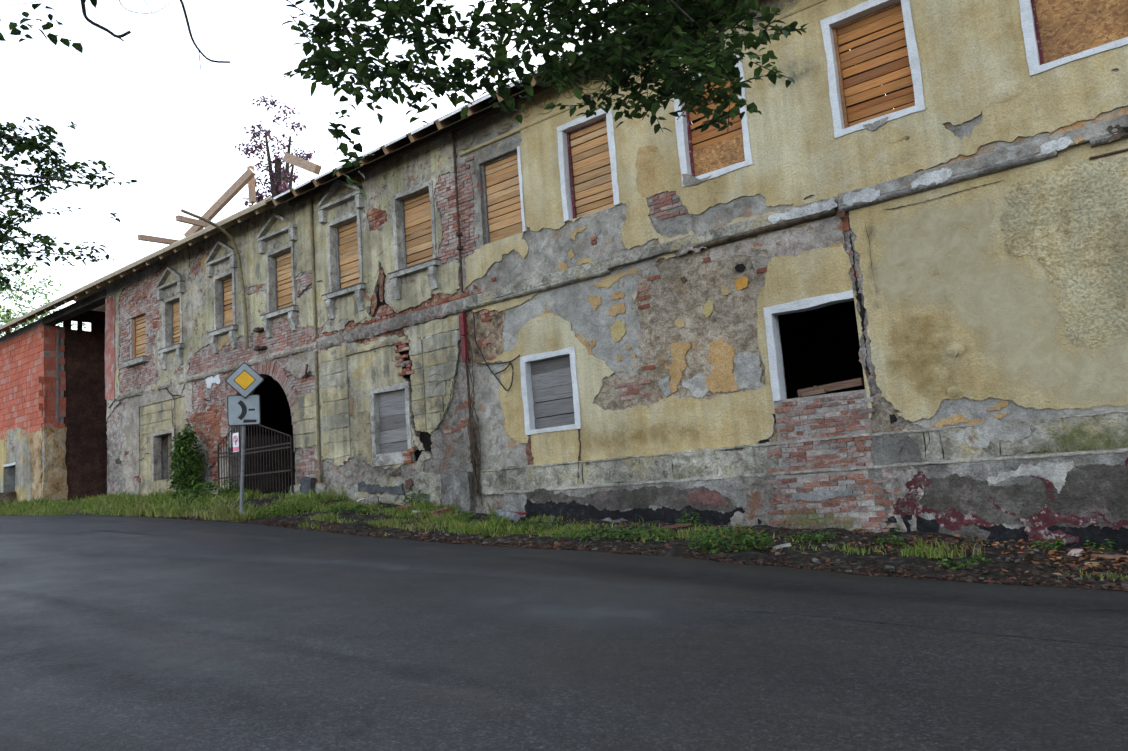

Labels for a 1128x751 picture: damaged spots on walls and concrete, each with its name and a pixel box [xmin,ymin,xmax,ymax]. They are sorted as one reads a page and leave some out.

flaking render [863,117,888,131]
flaking render [911,106,1128,188]
crack [371,251,389,317]
flaking render [176,112,880,490]
crack [842,181,999,415]
flaking render [106,261,163,496]
flaking render [870,388,1128,433]
peeling [893,471,1128,546]